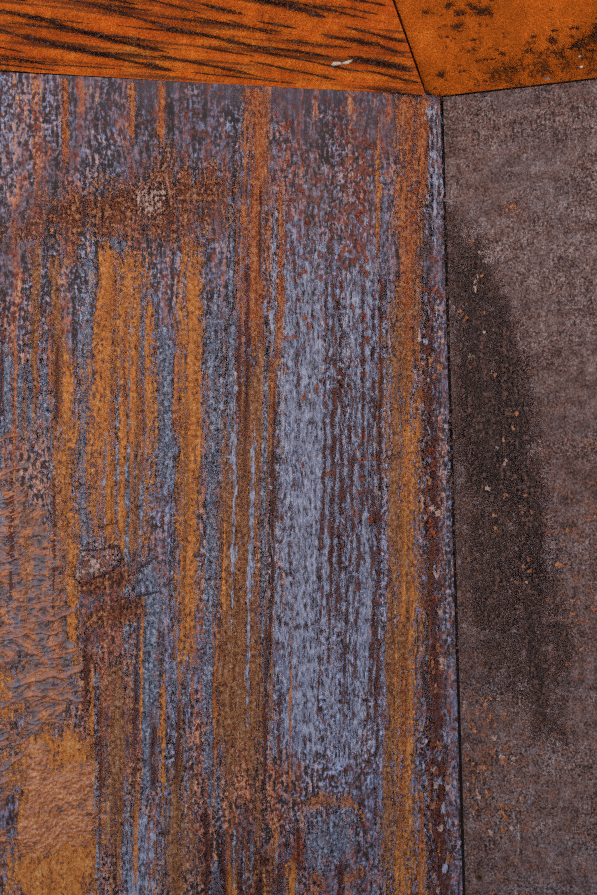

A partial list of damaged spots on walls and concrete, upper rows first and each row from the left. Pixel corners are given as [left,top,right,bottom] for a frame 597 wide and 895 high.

rust [0,78,324,895]
rust [306,790,366,821]
rust [352,95,455,895]
rust [463,697,519,815]
rust [488,802,523,837]
leakage [440,202,582,749]